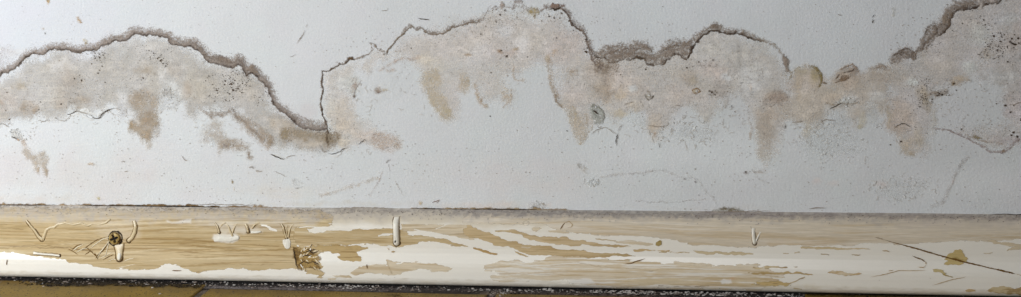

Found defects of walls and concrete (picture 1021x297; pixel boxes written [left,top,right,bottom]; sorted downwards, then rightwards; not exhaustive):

crack [40,107,117,122]
damp [0,0,1021,175]
flaking render [589,104,605,124]
peeling [0,200,1021,291]